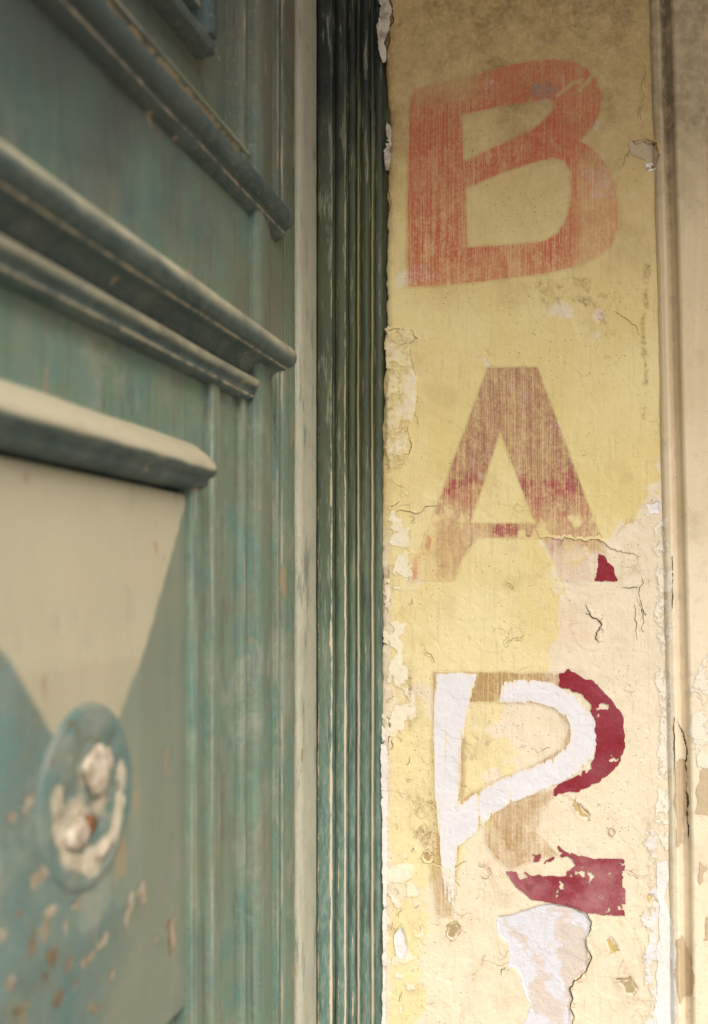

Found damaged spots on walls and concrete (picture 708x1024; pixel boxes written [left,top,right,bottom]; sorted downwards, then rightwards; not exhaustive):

flaking render [376,0,394,66]
spalling [619,134,662,172]
spalling [383,483,415,608]
crack [395,503,438,514]
crack [538,533,646,643]
spalling [380,598,425,1024]
peeling [27,895,109,981]
peeling [123,880,146,933]
spalling [496,904,590,1024]
crack [569,913,597,1024]